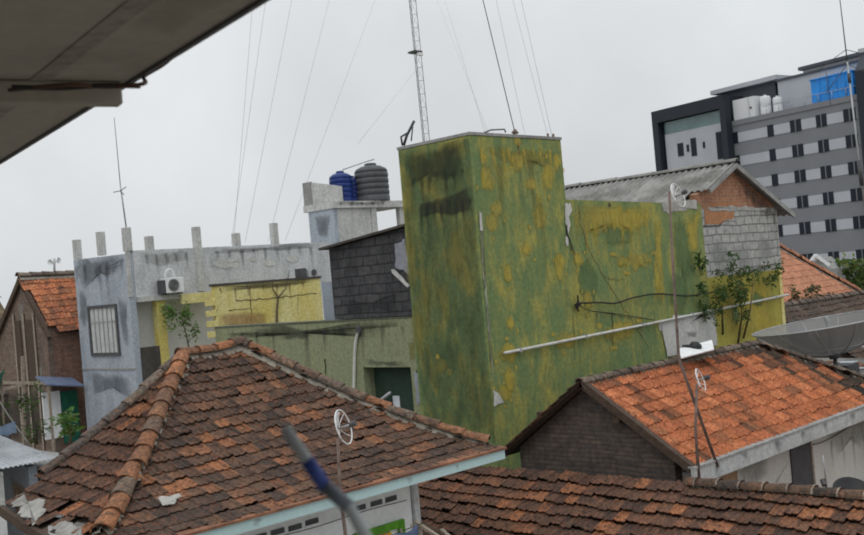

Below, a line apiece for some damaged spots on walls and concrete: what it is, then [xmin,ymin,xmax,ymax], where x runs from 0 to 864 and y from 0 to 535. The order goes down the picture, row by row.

peeling [553,200,736,350]
spalling [0,475,46,526]
spalling [52,521,82,535]